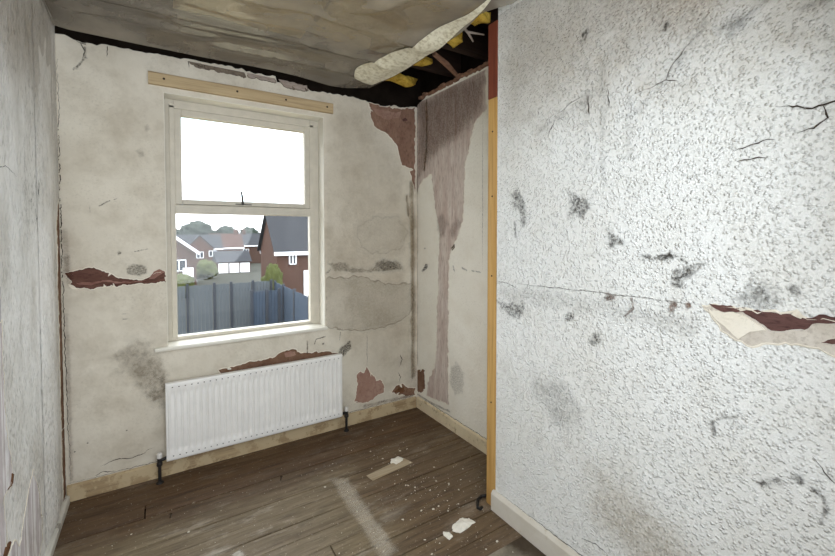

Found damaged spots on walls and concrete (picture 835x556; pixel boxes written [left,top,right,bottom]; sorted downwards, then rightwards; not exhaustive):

crack [782,100,835,132]
crack [735,139,774,162]
peeling [353,70,488,405]
peeling [56,198,166,502]
peeling [218,348,339,373]
peeling [702,303,835,358]